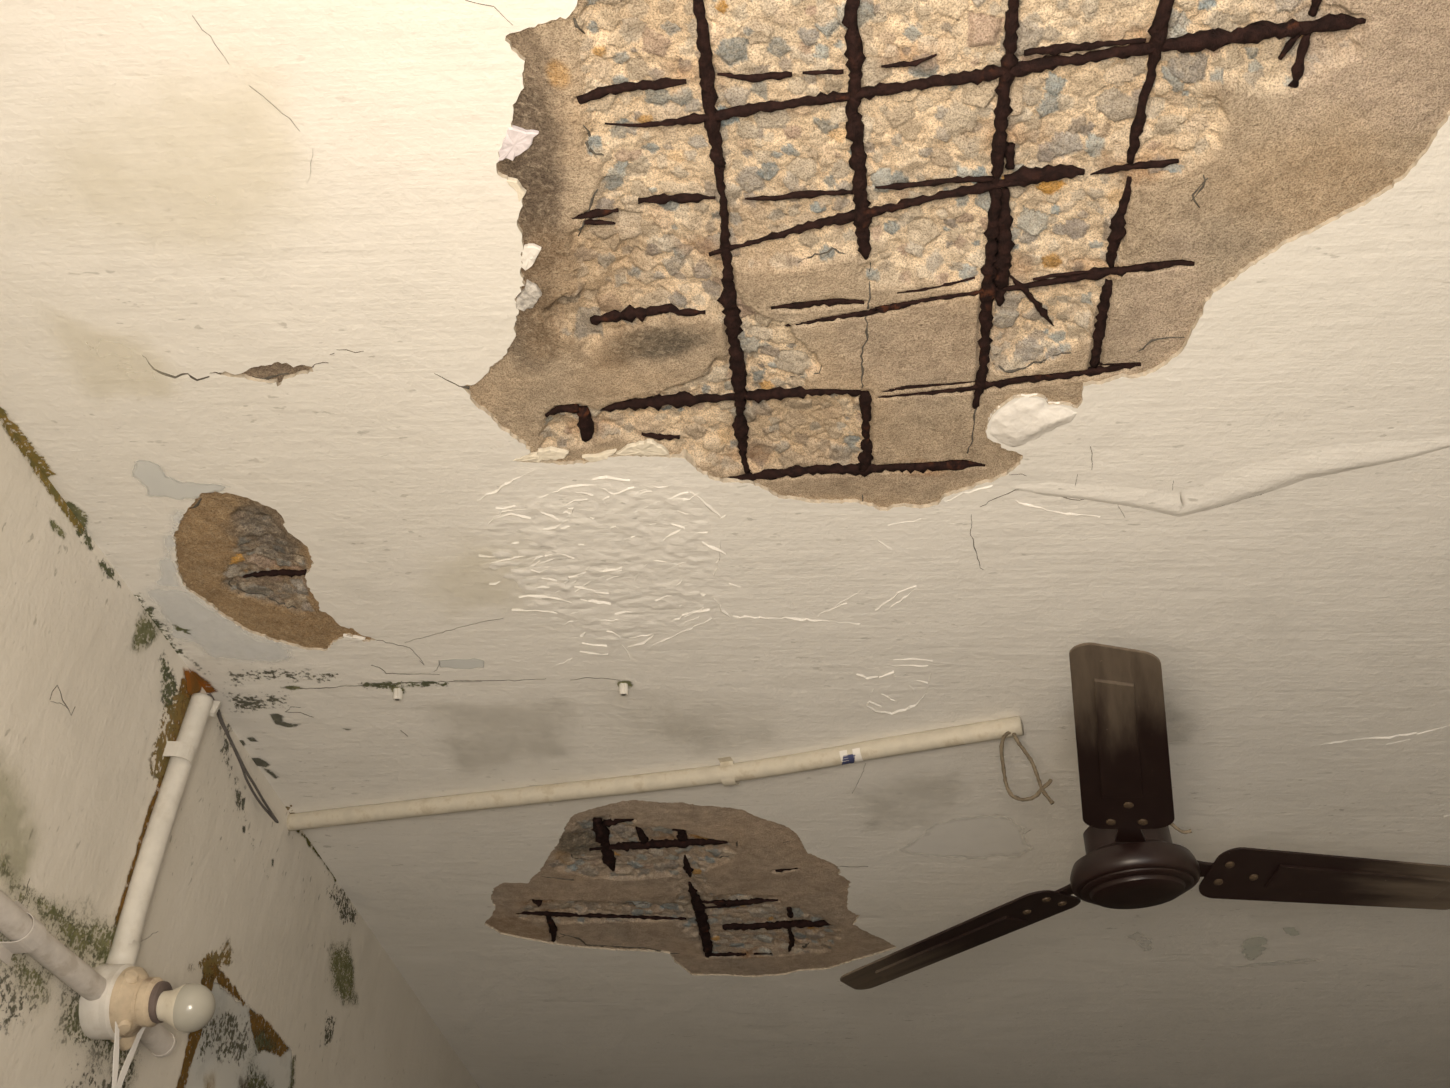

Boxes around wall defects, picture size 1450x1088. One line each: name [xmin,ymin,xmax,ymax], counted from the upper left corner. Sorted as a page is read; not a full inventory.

spalling [465,0,1450,507]
crack [142,355,221,381]
spalling [133,460,371,660]
leakage [0,857,118,968]
spalling [485,800,895,976]
leakage [0,934,134,1088]